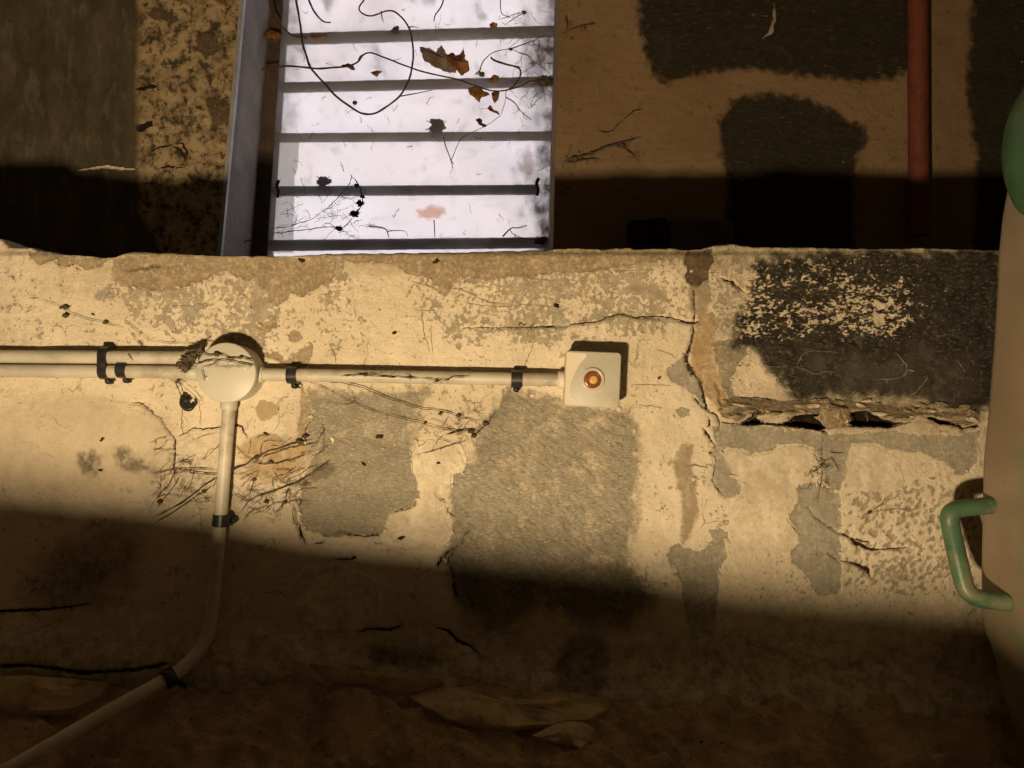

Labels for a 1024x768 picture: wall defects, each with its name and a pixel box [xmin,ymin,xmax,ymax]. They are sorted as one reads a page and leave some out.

peeling [297,385,430,538]
peeling [442,389,644,618]
crack [412,281,928,476]
peeling [666,446,728,641]
peeling [709,340,981,596]
crack [813,514,907,576]
crack [1,663,165,675]